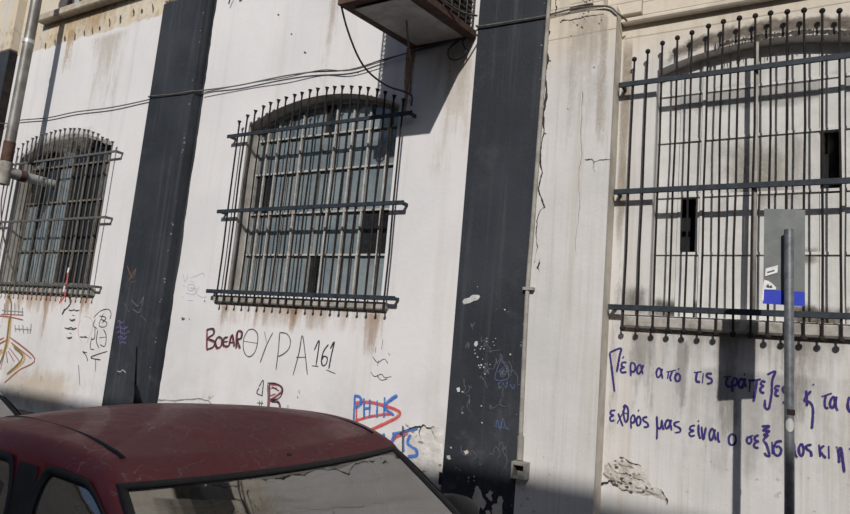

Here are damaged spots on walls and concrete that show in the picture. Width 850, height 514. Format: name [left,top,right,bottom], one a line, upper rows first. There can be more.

corrosion [404,48,416,111]
crack [534,0,604,269]
crack [579,91,611,171]
crack [158,397,212,405]
flaking render [396,424,452,491]
peeling [467,475,503,514]
flaking render [603,457,667,505]